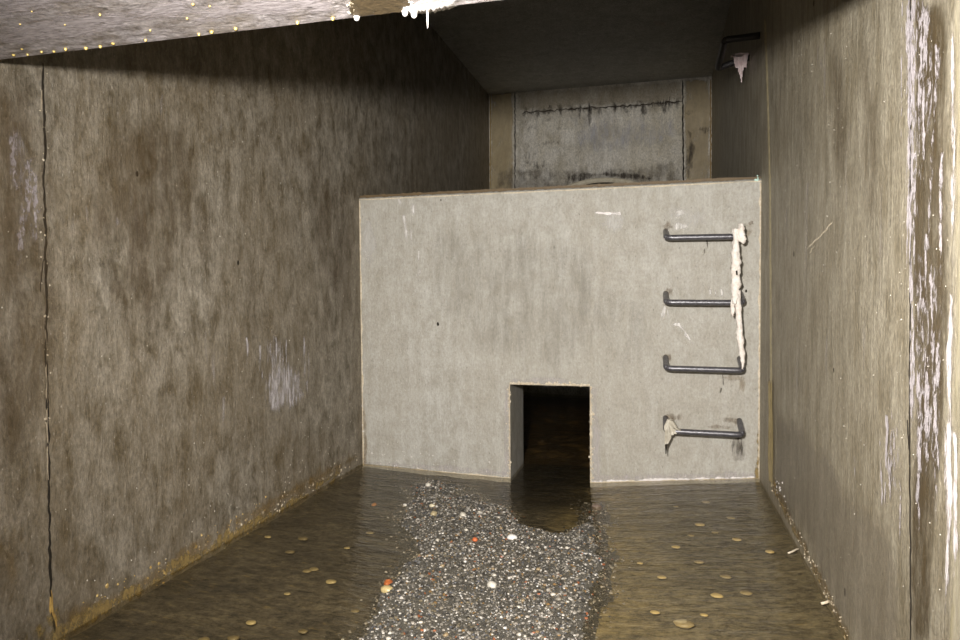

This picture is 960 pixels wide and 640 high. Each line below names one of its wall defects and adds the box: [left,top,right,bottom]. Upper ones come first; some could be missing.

efflorescence [401,0,457,28]
crack [39,64,56,632]
damp [37,80,761,640]
damp [901,0,960,640]